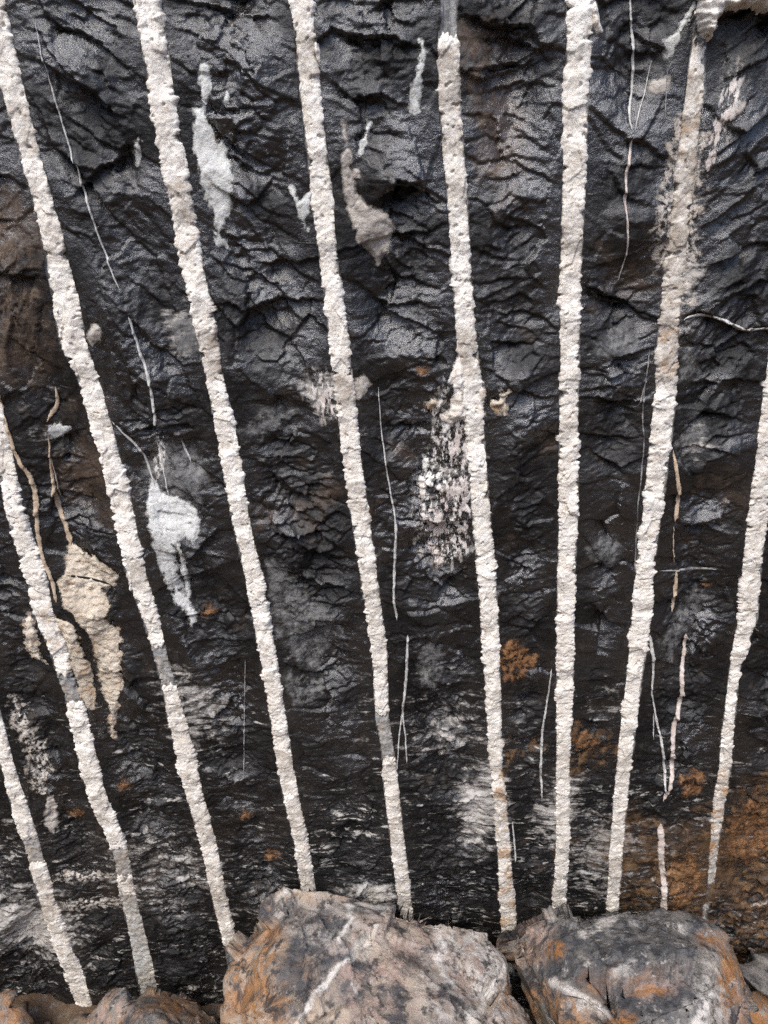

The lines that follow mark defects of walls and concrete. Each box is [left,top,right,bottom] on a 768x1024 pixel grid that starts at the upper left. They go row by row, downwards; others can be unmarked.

water stain [662,2,696,60]
water stain [192,63,233,249]
water stain [288,185,311,232]
water stain [340,120,395,266]
water stain [682,74,745,306]
water stain [47,422,71,437]
water stain [146,440,200,626]
water stain [415,377,473,567]
corrosion [500,640,539,682]
water stain [7,694,59,832]
corrosion [680,768,705,798]
corrosion [619,779,768,960]